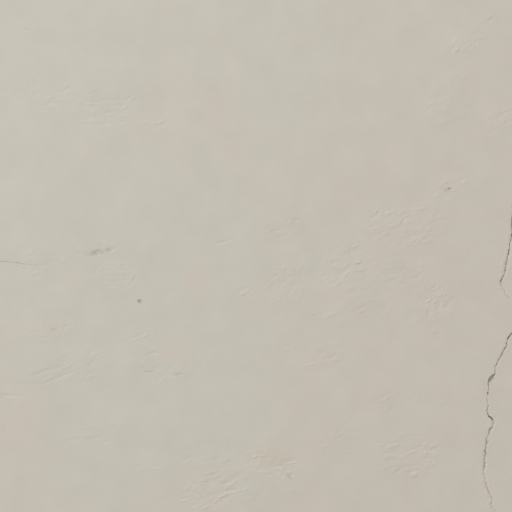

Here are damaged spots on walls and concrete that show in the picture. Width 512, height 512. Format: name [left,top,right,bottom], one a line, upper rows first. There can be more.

crack [500,217,512,298]
crack [483,333,512,512]